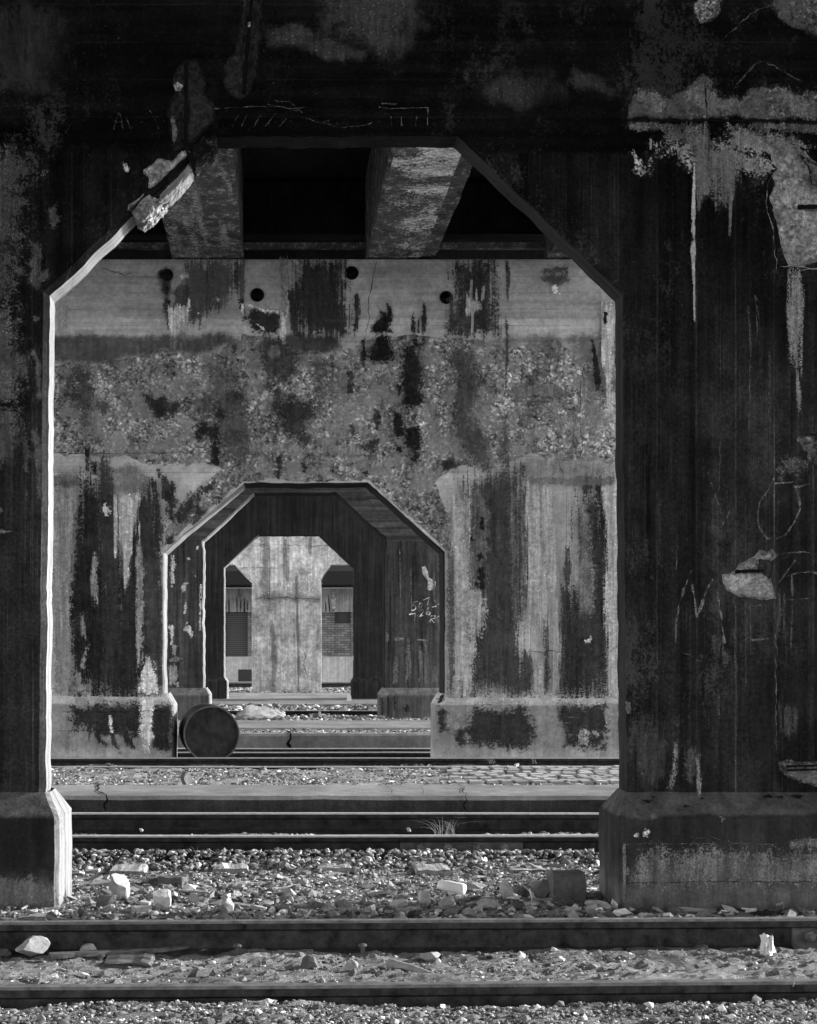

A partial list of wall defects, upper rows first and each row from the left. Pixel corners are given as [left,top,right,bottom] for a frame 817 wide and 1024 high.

spalling [128,59,233,257]
spalling [626,73,817,122]
damp [628,83,817,322]
spalling [768,141,817,267]
damp [167,257,300,350]
spalling [0,138,616,551]
damp [504,296,616,420]
damp [51,447,99,709]
damp [88,464,202,754]
damp [506,457,618,699]
spalling [722,549,778,600]
crack [96,784,108,811]